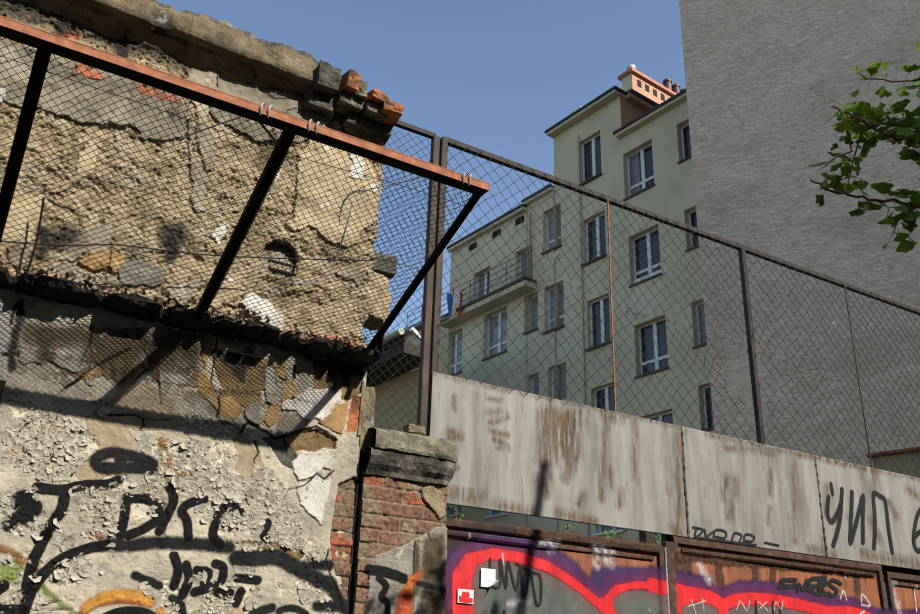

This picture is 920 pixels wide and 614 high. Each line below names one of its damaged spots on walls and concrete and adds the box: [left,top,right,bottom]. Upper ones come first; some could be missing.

flaking render [0,36,37,109]
flaking render [37,54,283,214]
flaking render [45,224,206,306]
flaking render [210,277,284,331]
flaking render [335,262,367,285]
peeling [0,326,364,614]
rust [539,398,583,468]
flaking render [365,486,447,614]